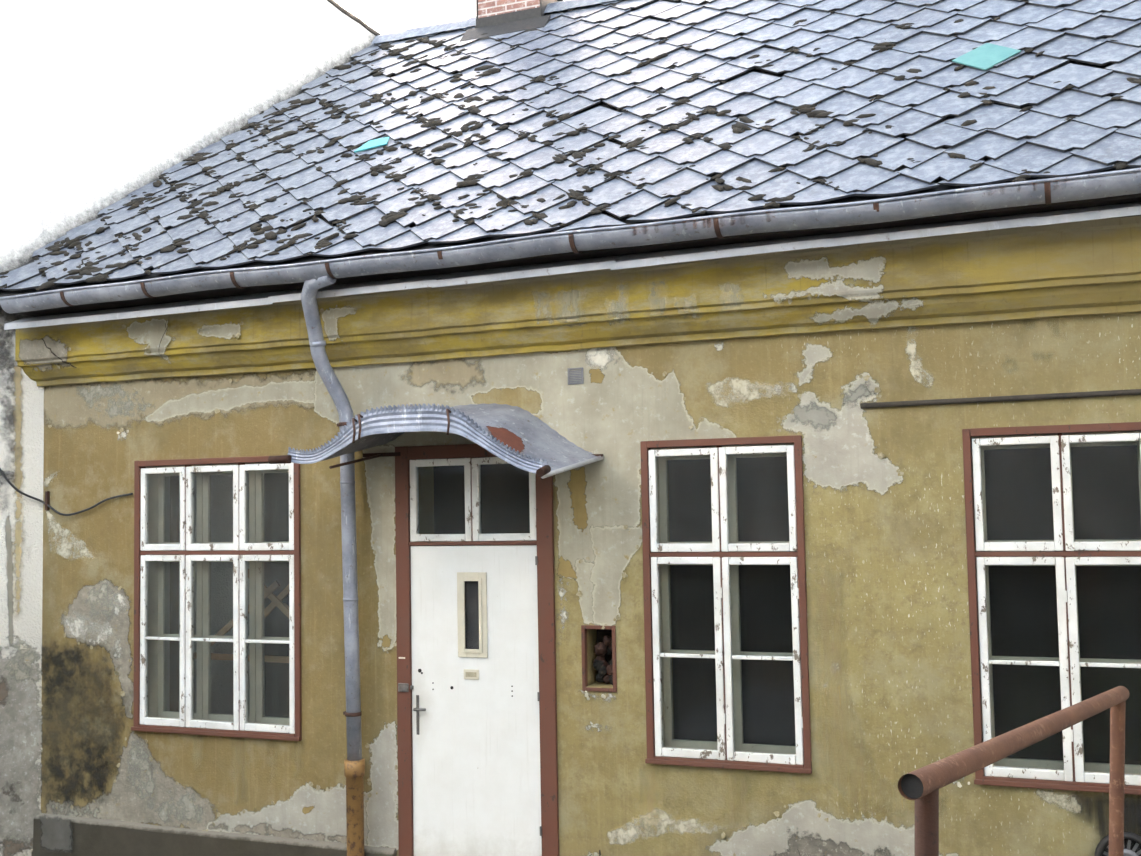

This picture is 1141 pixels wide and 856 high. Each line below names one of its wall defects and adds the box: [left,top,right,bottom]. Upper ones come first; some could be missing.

peeling [764,256,923,325]
spalling [19,336,77,372]
peeling [122,318,175,364]
peeling [197,321,244,340]
peeling [44,370,339,438]
peeling [775,343,904,495]
peeling [332,347,737,653]
water stain [42,649,120,802]
spalling [0,579,347,856]
spalling [364,721,399,851]
water stain [40,815,73,852]
spalling [705,800,914,856]